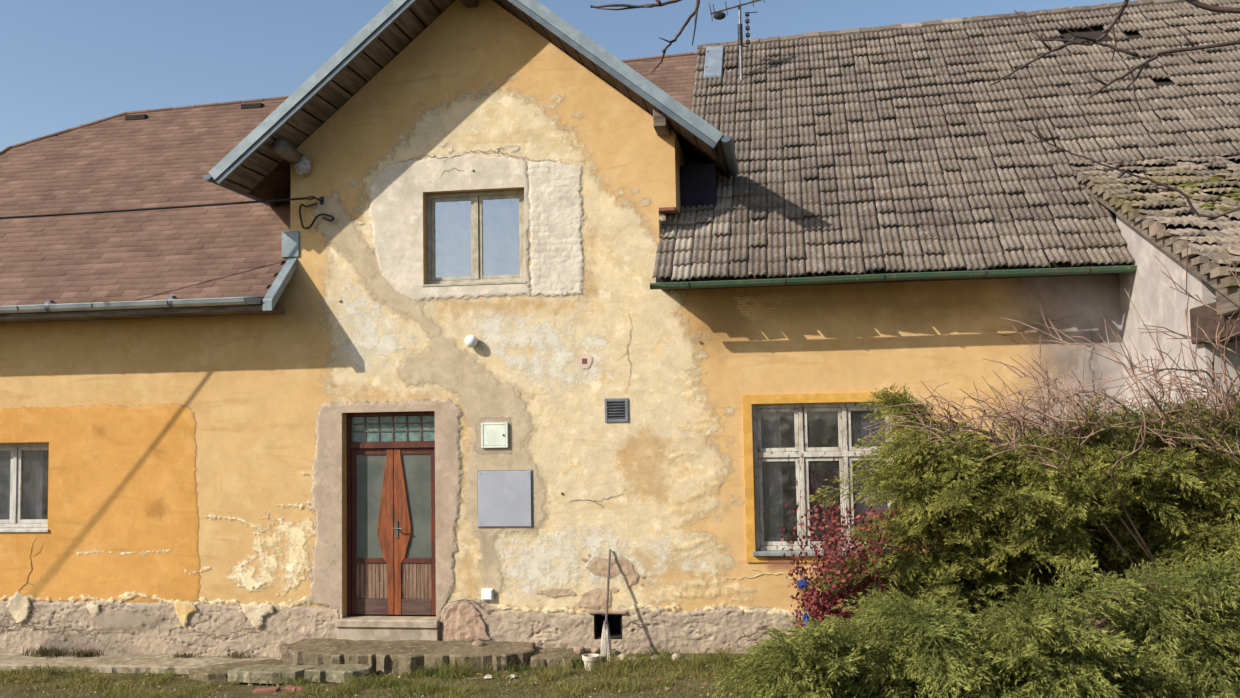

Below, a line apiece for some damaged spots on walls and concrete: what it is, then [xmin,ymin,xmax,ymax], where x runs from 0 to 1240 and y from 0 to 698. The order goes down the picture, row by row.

peeling [319,75,803,641]
crack [0,539,138,638]
peeling [0,500,316,613]